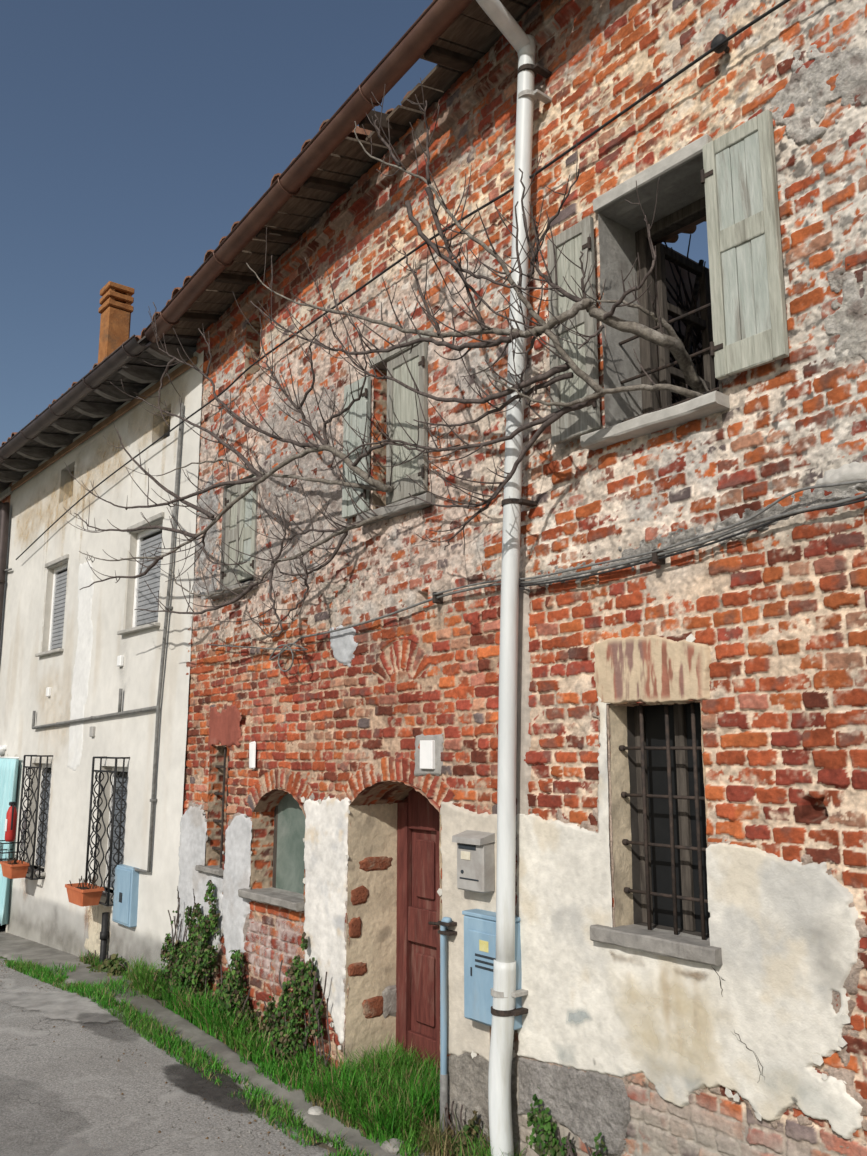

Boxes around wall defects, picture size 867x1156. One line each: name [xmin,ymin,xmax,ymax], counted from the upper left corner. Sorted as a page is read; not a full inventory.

flaking render [437,799,497,1061]
flaking render [511,696,867,1149]
crack [734,1031,763,1083]